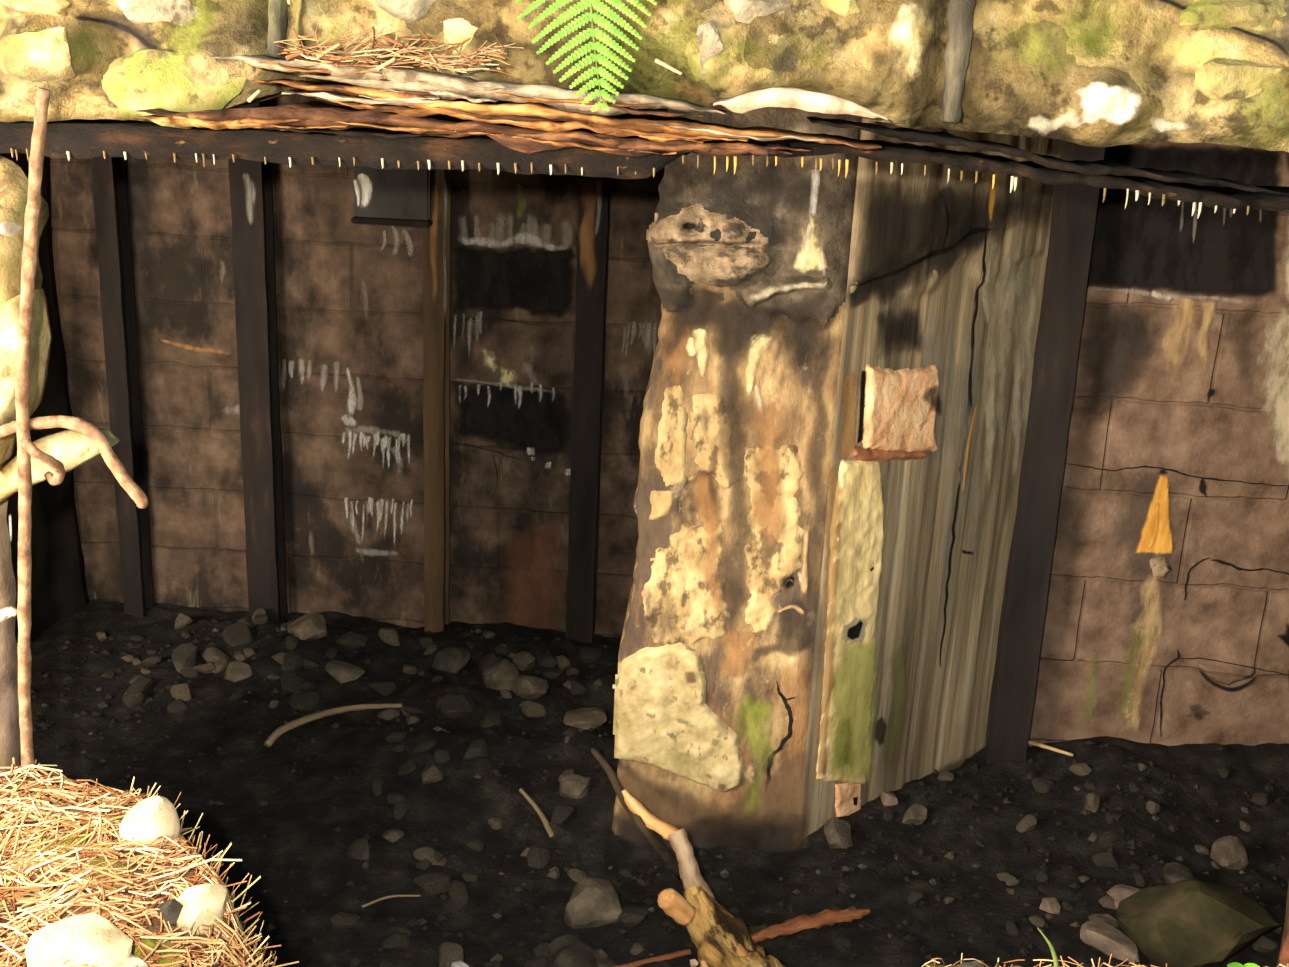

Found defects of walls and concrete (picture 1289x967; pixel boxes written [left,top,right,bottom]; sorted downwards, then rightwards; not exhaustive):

leakage [486,356,514,386]
crack [849,189,989,667]
leakage [1265,313,1289,462]
flaking render [613,364,941,817]
crack [1184,558,1289,601]
crack [765,681,795,790]
crack [1160,651,1289,737]